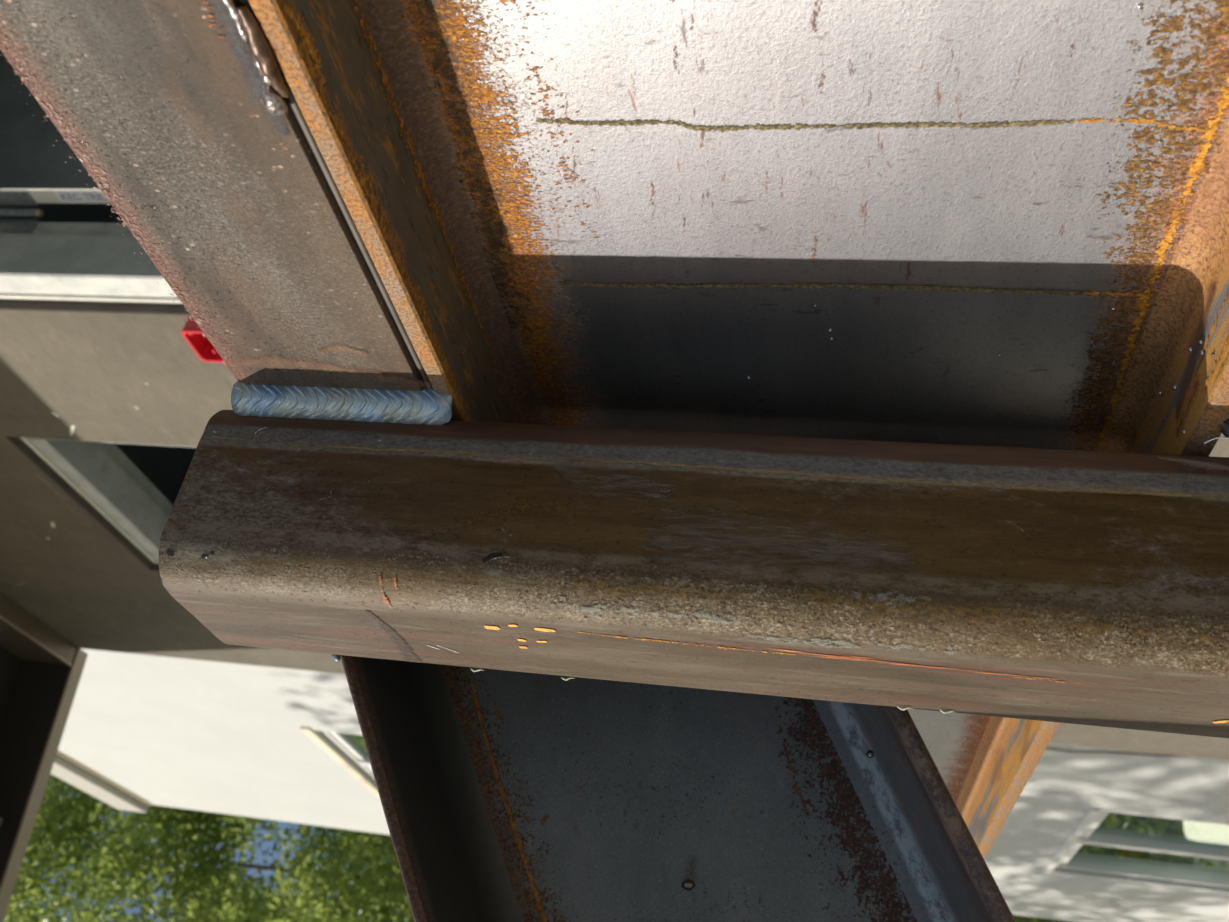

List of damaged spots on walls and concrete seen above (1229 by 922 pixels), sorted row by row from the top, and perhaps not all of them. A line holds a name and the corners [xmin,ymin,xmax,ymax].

rust [0,34,212,337]
rust [279,0,455,387]
rust [347,0,494,362]
rust [397,0,599,384]
rust [1064,0,1229,451]
rust [441,664,578,922]
rust [484,625,556,649]
rust [574,631,1065,683]
rust [766,697,917,922]